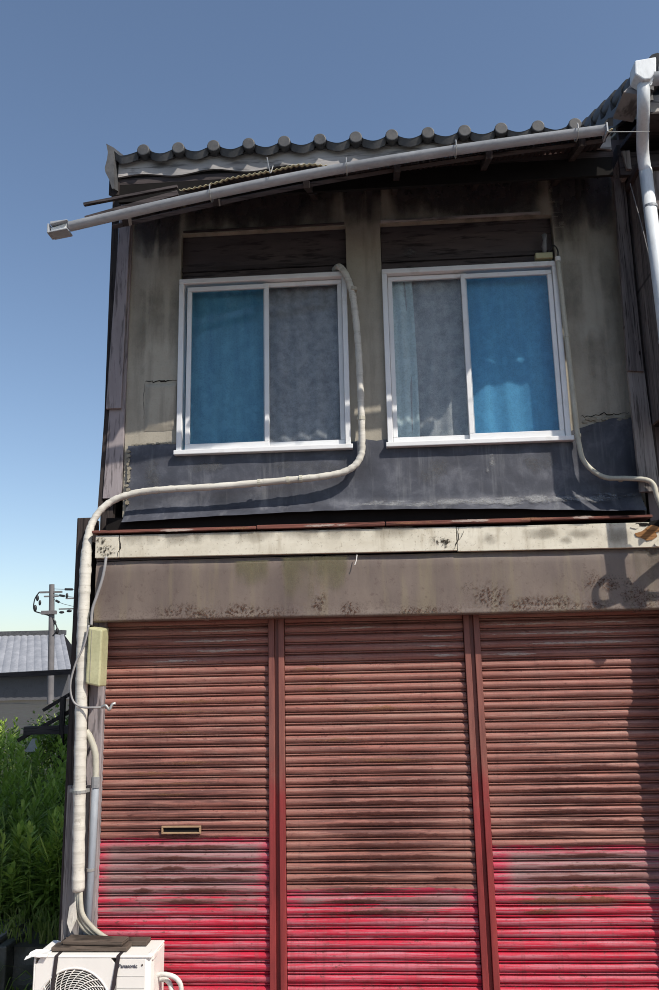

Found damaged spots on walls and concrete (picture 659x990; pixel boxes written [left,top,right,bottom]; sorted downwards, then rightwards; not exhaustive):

spalling [631,520,659,547]
corrosion [468,575,659,613]